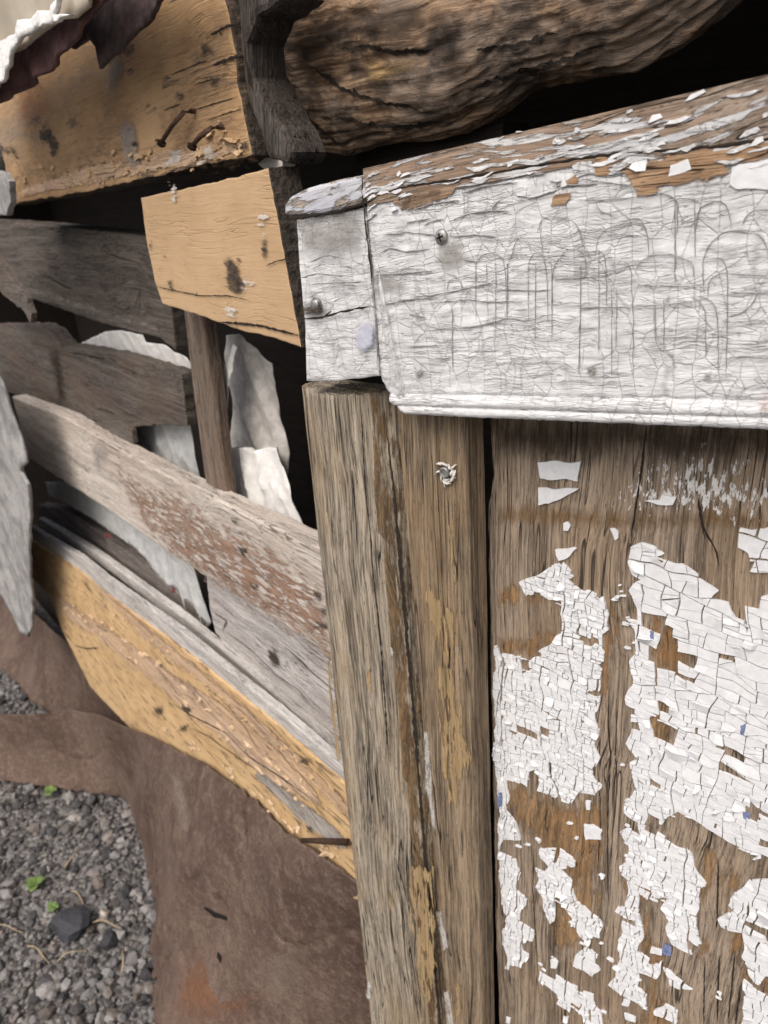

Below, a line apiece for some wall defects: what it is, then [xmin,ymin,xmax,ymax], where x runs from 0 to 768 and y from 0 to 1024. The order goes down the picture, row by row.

peeling [363,75,768,220]
crack [134,138,768,375]
peeling [508,460,620,540]
crack [631,425,647,540]
peeling [645,494,677,505]
crack [698,499,719,565]
peeling [705,513,768,573]
rust [0,595,371,1024]
peeling [492,542,768,1024]